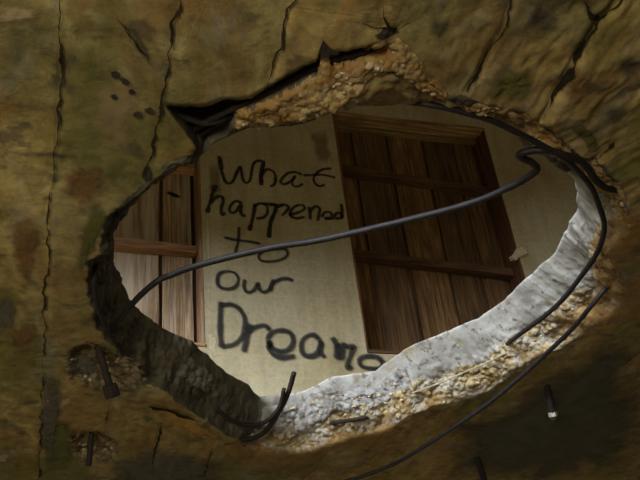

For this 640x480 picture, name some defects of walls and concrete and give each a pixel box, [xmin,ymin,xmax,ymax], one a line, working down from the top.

crack [112,0,182,166]
crack [268,0,297,82]
crack [466,0,512,92]
crack [544,0,623,117]
crack [38,1,64,479]
spalling [110,27,639,480]
spalling [63,341,147,393]